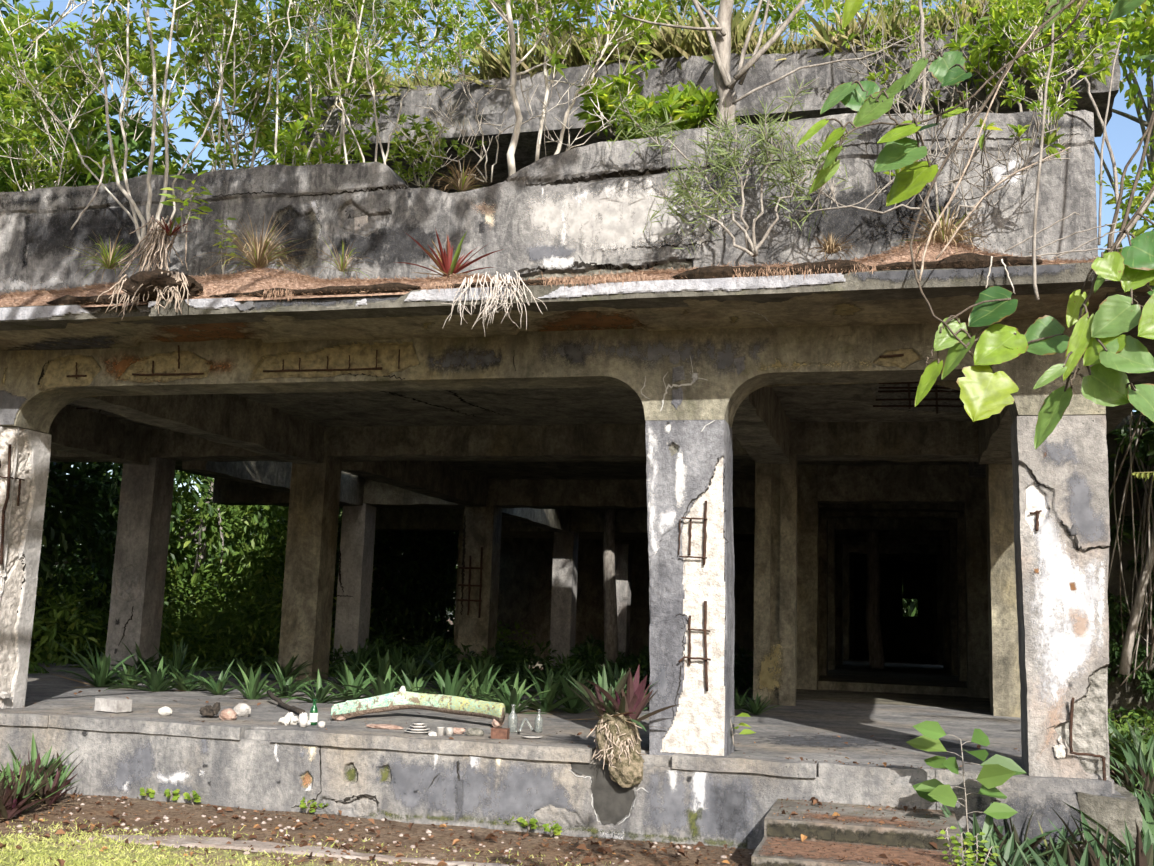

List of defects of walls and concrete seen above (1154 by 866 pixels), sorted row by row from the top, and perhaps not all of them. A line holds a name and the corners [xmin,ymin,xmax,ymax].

spalling [339,201,391,237]
spalling [38,355,101,391]
spalling [117,345,212,383]
crack [641,357,707,411]
spalling [0,427,35,708]
spalling [650,457,725,756]
crack [683,457,728,580]
crack [672,618,687,720]
peeling [1018,460,1143,864]
crack [291,745,380,818]